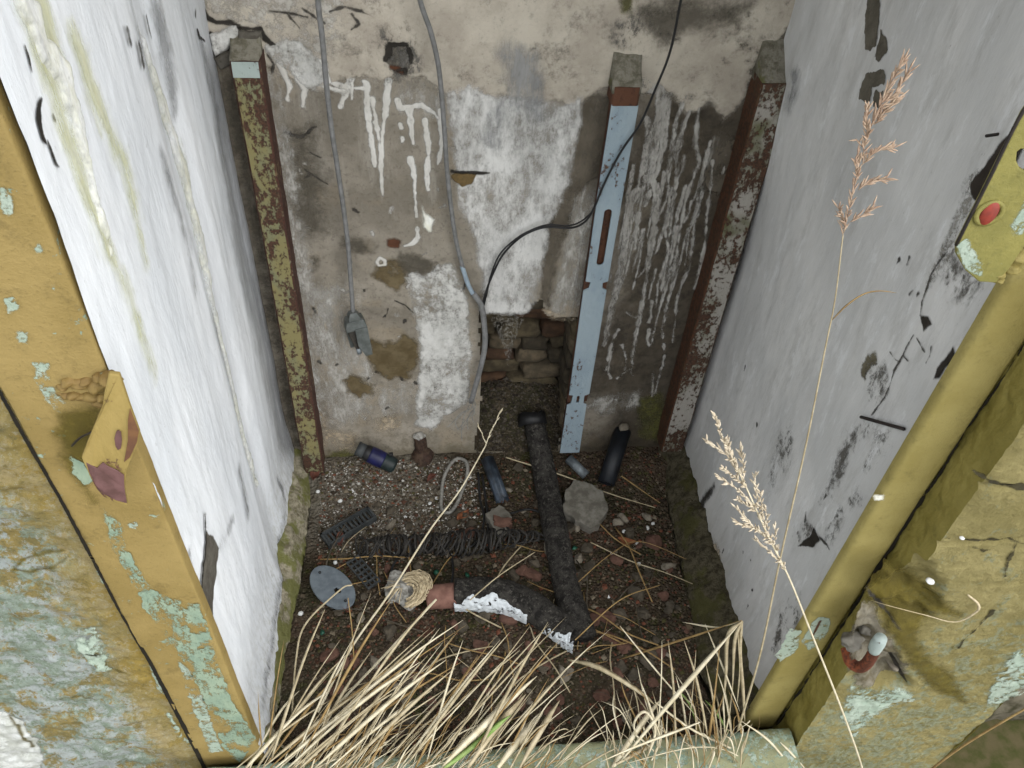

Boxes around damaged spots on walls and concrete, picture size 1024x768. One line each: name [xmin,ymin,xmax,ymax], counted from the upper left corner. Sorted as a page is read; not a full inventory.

peeling [859,0,888,108]
peeling [0,188,13,215]
damp [265,39,443,247]
damp [372,260,409,290]
peeling [206,0,795,320]
damp [541,94,609,306]
damp [601,77,735,398]
peeling [32,362,64,407]
damp [368,335,419,380]
peeling [70,457,92,485]
peeling [105,514,256,762]
peeling [771,607,830,662]